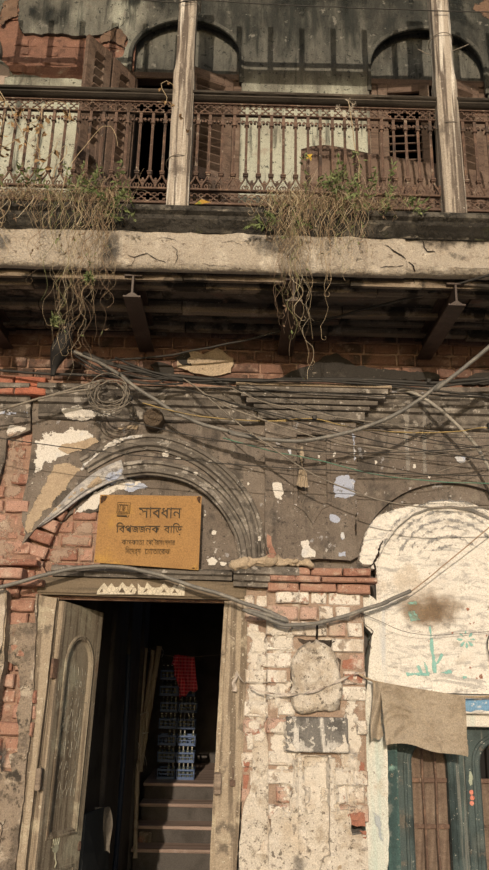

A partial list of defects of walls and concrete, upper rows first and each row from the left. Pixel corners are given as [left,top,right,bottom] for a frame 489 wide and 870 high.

water stain [451,0,473,28]
peeling [473,0,489,19]
flaking render [0,0,136,84]
flaking render [0,375,49,399]
peeling [0,411,26,435]
flaking render [24,405,147,534]
flaking render [342,659,363,684]
flaking render [348,812,367,839]